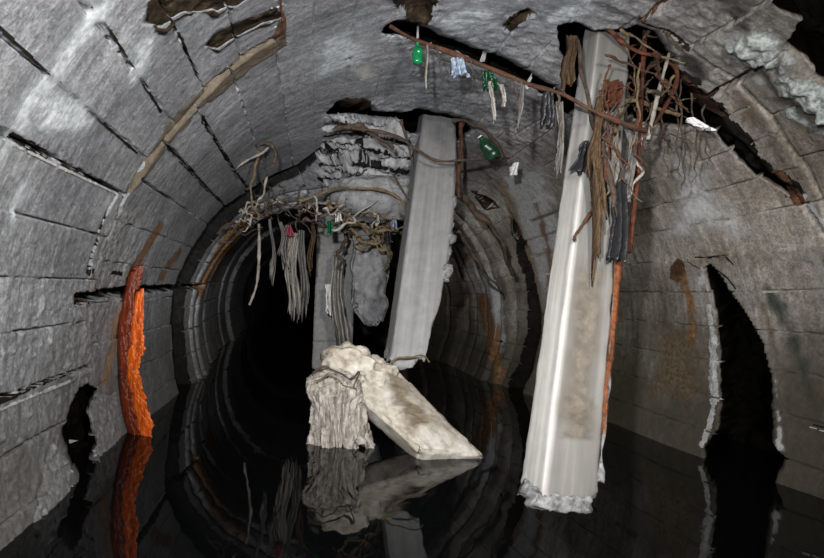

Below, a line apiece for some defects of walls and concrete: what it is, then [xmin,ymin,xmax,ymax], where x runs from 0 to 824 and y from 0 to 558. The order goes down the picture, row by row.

spalling [147,0,244,34]
spalling [208,0,287,53]
spalling [393,0,437,25]
damp [724,7,796,82]
damp [0,1,114,165]
crack [637,0,824,230]
damp [776,76,824,136]
corrosion [102,222,163,437]
corrosion [477,294,507,381]
corrosion [670,258,700,343]
crack [686,255,736,289]
spalling [88,384,122,457]